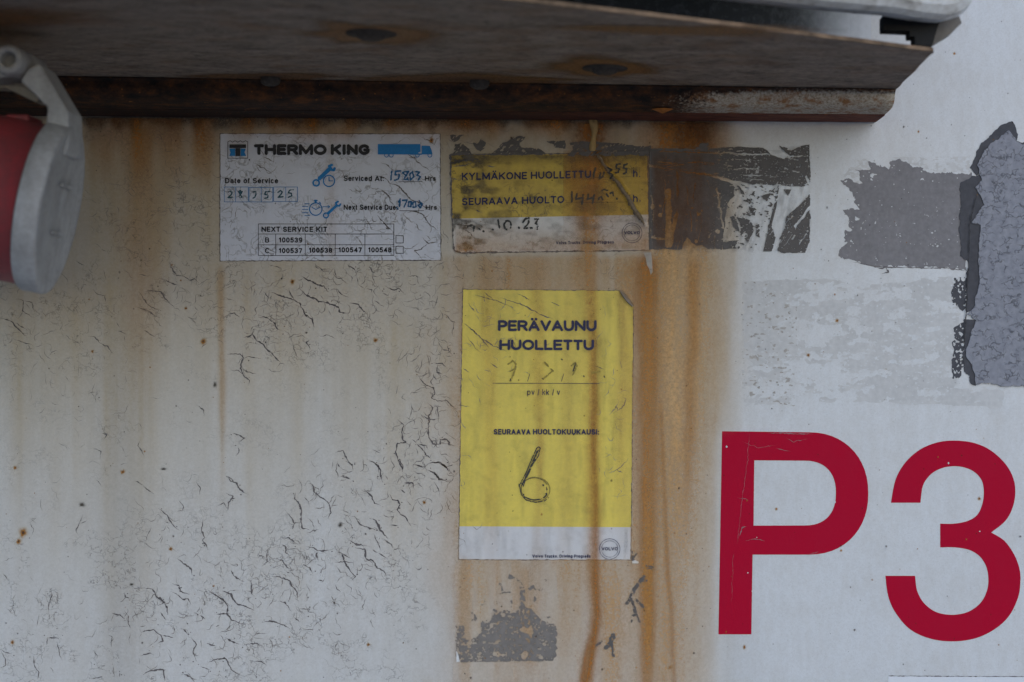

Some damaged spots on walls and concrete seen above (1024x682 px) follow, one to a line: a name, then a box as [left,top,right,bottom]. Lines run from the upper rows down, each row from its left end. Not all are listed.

peeling [730,185,811,253]
crack [1,122,559,681]
crack [594,333,639,497]
corrosion [639,122,711,674]
corrosion [581,496,600,682]